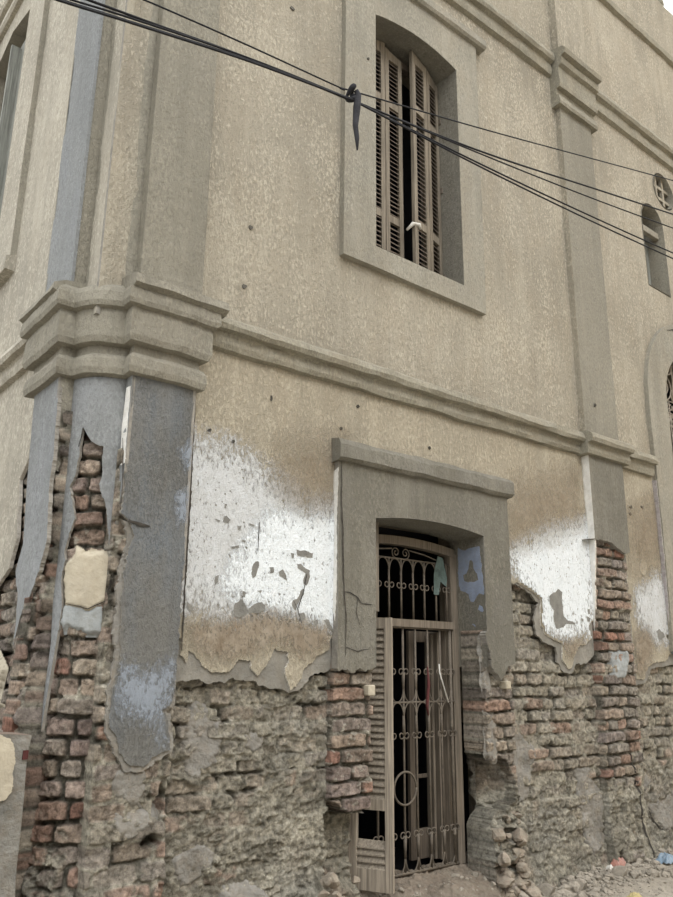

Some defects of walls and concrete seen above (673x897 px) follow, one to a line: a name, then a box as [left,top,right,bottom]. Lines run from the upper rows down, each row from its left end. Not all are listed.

spalling [0,386,375,897]
crack [181,401,196,651]
crack [341,462,372,656]
spalling [457,540,673,897]